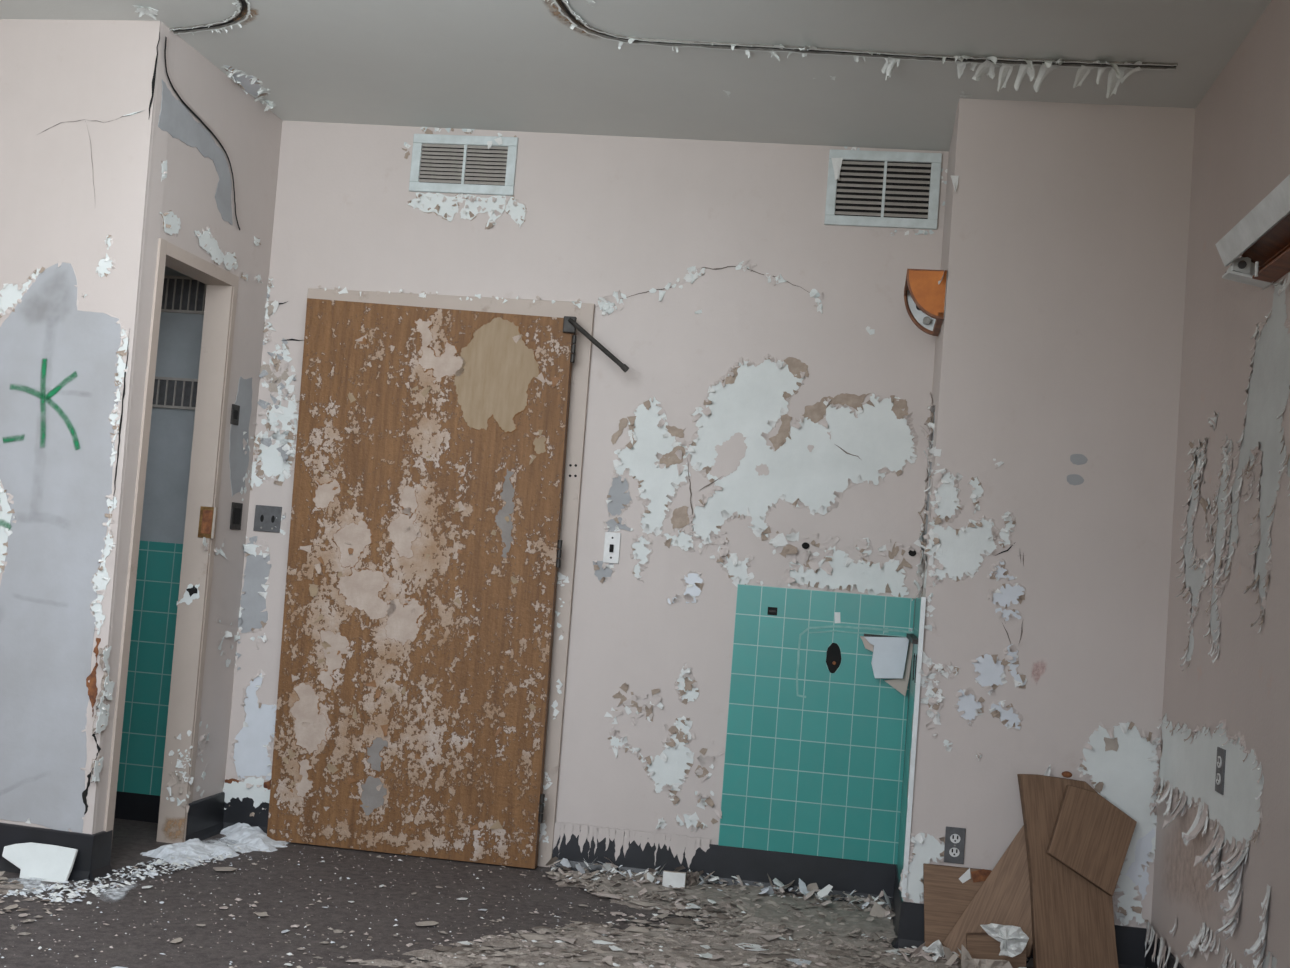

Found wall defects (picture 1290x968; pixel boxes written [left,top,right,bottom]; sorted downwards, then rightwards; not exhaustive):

spalling [96,235,116,278]
peeling [0,261,129,833]